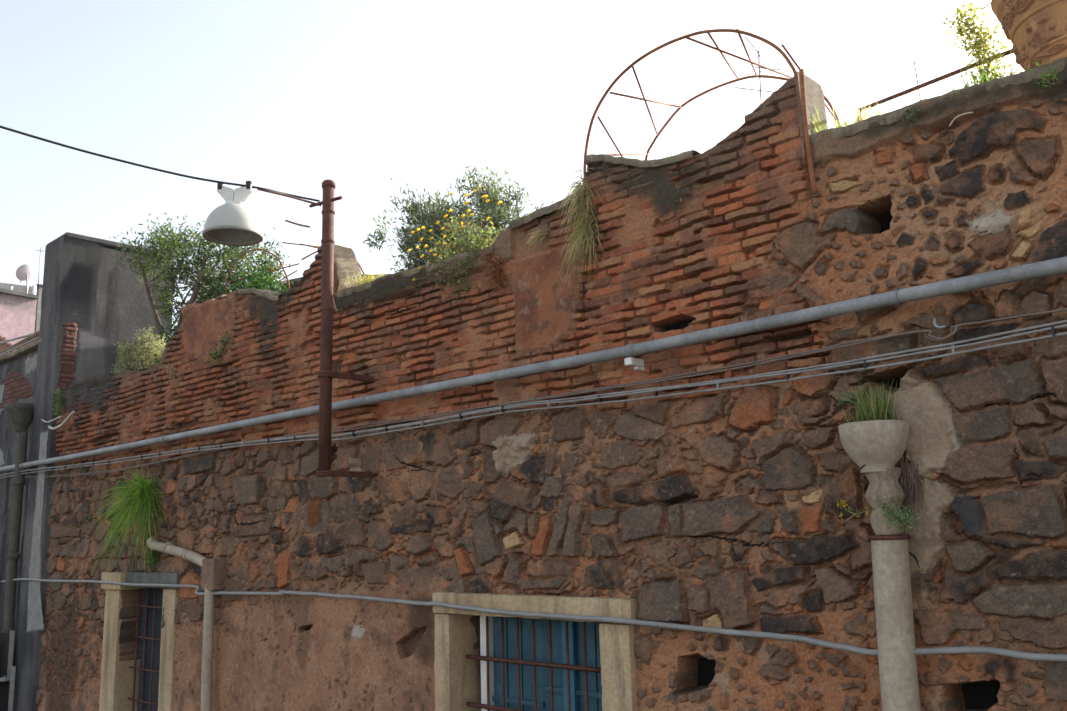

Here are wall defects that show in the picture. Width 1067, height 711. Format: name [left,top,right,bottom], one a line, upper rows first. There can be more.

spalling [0,353,38,414]